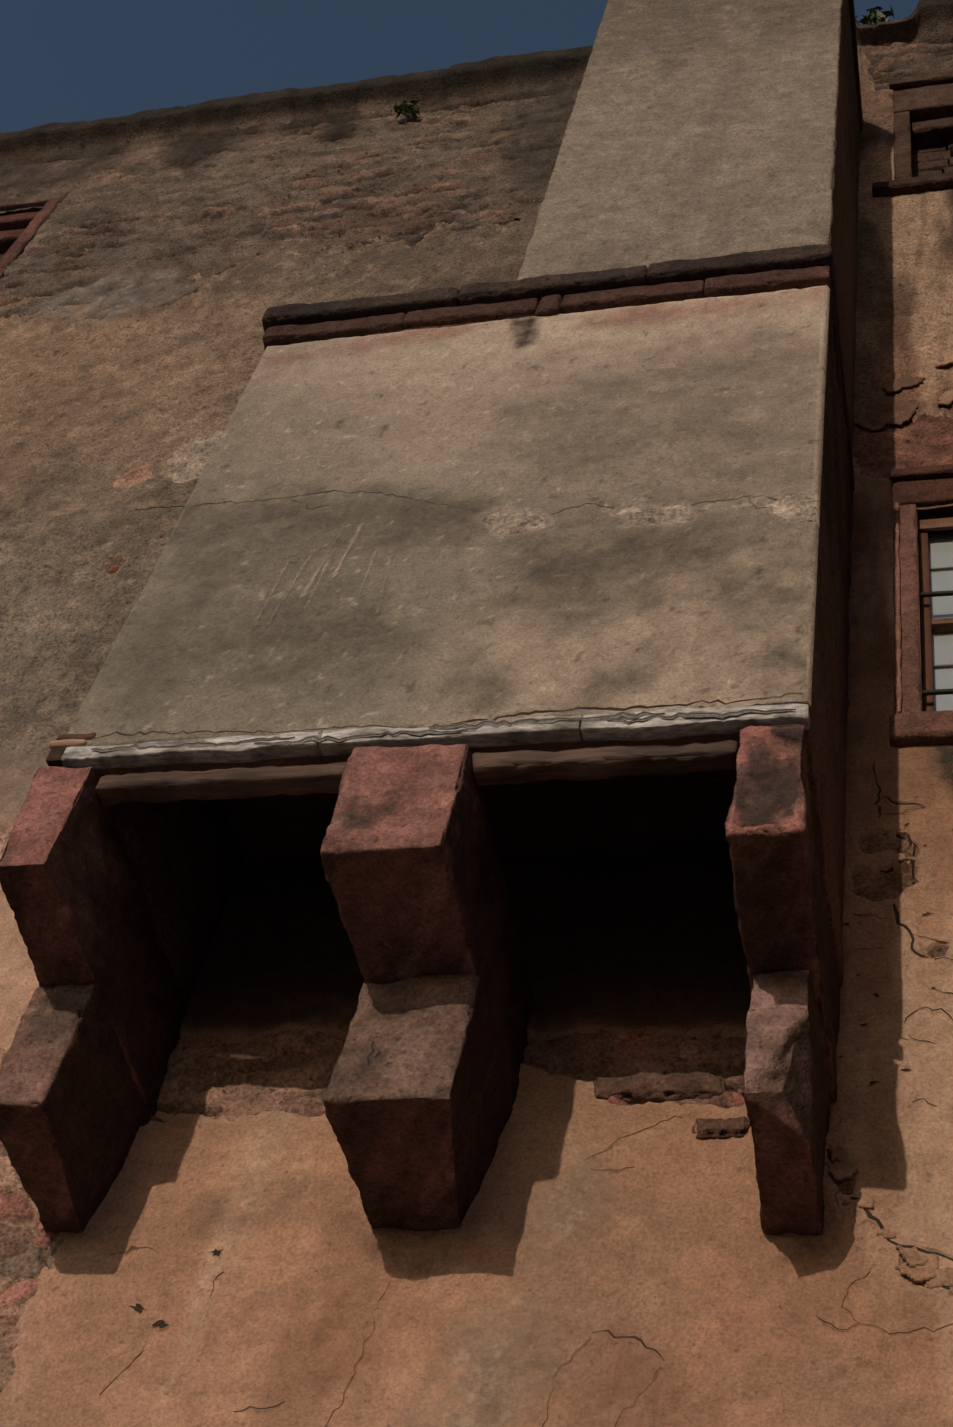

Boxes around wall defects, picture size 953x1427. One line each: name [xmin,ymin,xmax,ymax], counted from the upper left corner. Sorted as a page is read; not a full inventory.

flaking render [853,353,953,480]
crack [134,490,469,511]
crack [866,761,926,819]
spalling [852,828,922,902]
crack [854,903,953,1044]
flaking render [523,1027,746,1109]
flaking render [0,1140,65,1394]
crack [815,1141,953,1336]
crack [541,1325,665,1427]